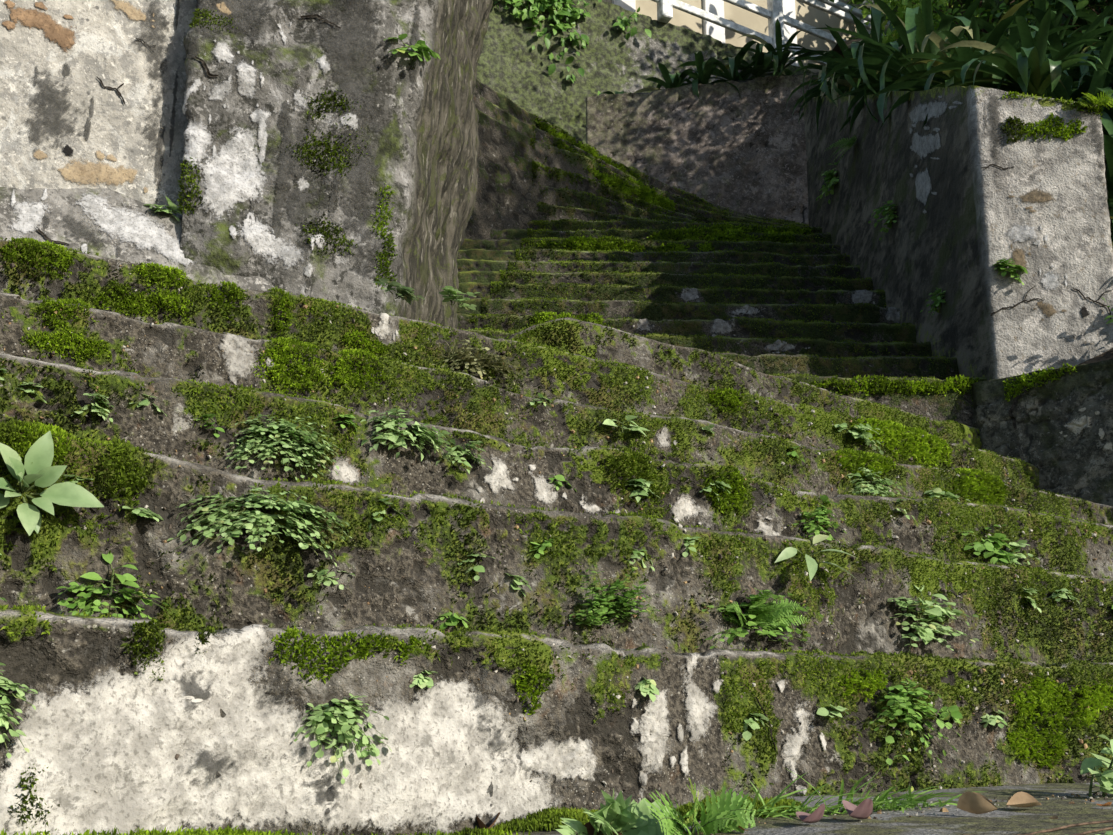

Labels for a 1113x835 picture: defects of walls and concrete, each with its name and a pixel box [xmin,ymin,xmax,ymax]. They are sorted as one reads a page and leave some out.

spalling [2,0,81,52]
crack [97,77,125,104]
flaking render [909,95,962,214]
crack [990,286,1044,316]
crack [1073,288,1111,319]